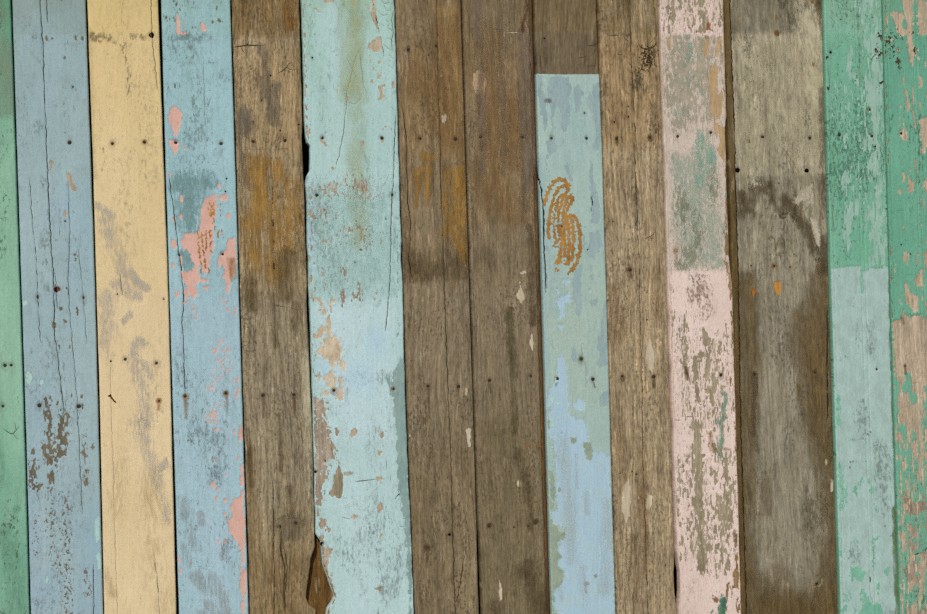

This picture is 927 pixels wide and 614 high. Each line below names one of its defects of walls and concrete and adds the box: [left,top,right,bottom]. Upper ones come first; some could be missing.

peeling [168,105,187,156]
peeling [303,0,334,146]
peeling [366,0,395,100]
peeling [171,182,238,319]
peeling [661,0,741,613]
peeling [831,0,927,614]
peeling [203,337,243,441]
peeling [307,167,400,614]
peeling [28,396,95,614]
peeling [211,455,248,614]
peeling [377,358,413,614]